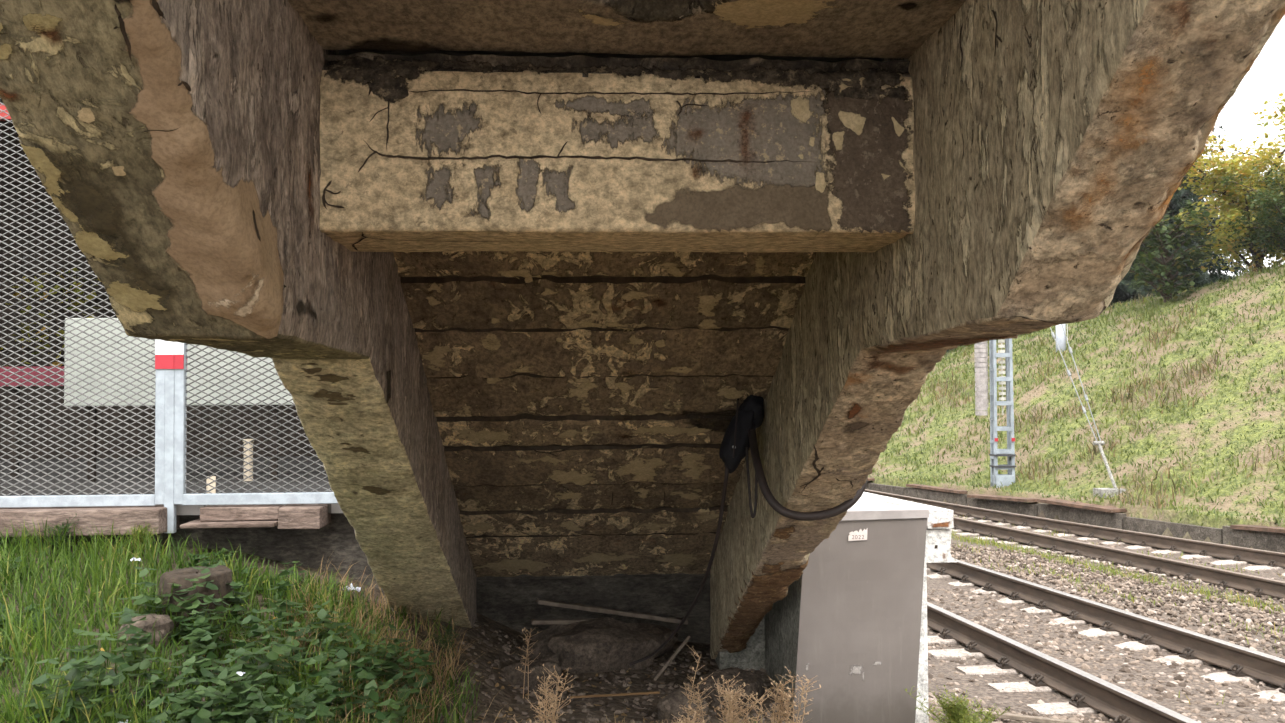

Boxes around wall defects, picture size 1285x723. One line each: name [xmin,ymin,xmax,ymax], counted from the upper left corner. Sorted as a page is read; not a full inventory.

peeling [578,0,839,29]
peeling [76,107,97,124]
crack [322,82,811,251]
peeling [324,56,914,234]
peeling [18,136,129,261]
peeling [97,276,167,312]
peeling [497,269,588,298]
peeling [519,455,596,504]
crack [446,445,699,457]
peeling [611,381,719,520]
crack [800,446,853,493]
spalling [719,558,809,653]